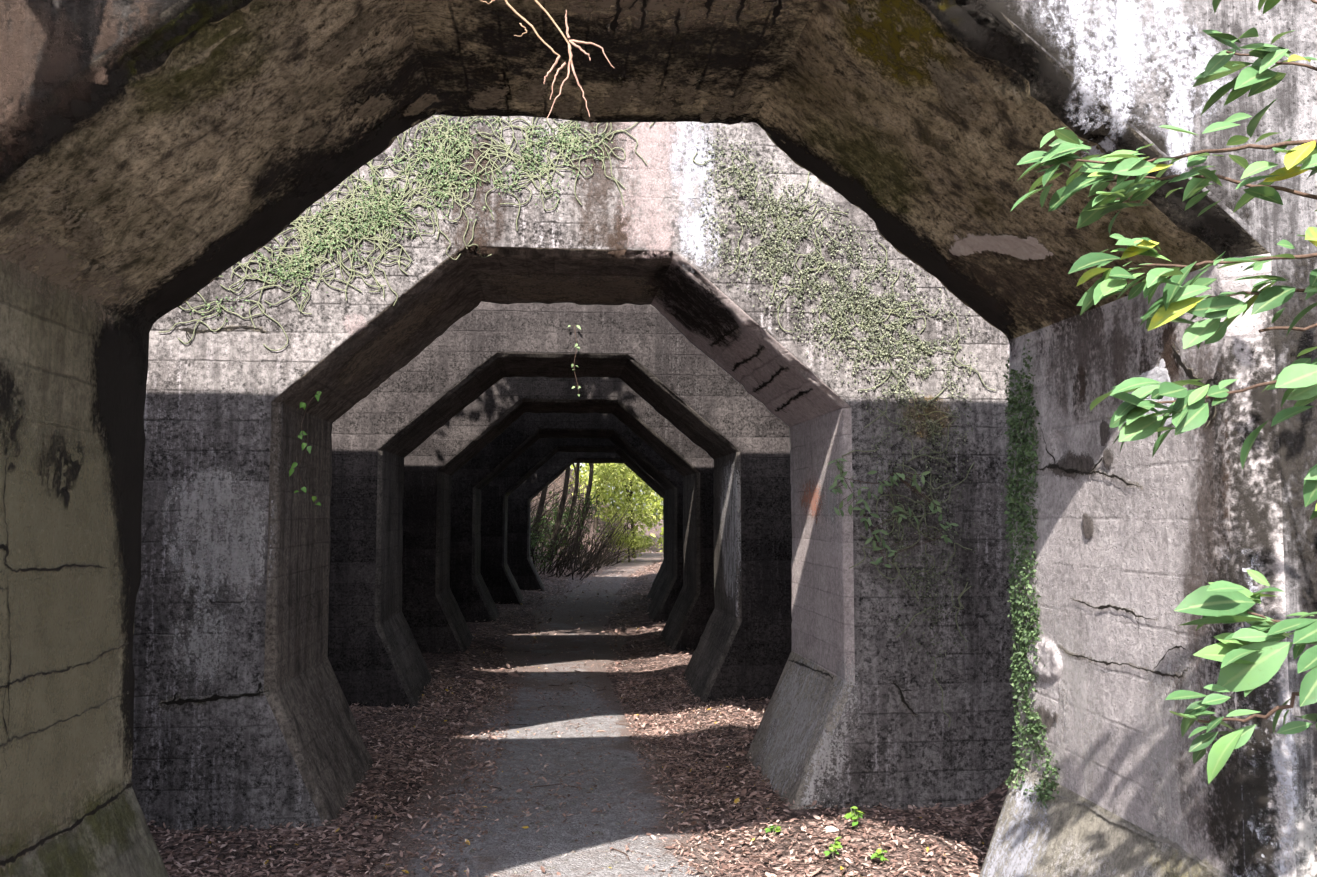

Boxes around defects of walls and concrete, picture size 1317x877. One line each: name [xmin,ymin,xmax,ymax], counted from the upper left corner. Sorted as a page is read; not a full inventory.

crack [710,326,813,413]
peeling [1123,359,1174,427]
spalling [1052,421,1113,480]
damp [1207,249,1317,645]
spalling [1082,513,1094,539]
crack [0,460,129,765]
crack [1057,598,1190,678]
crack [159,682,270,710]
damp [755,659,858,809]
damp [980,653,1197,877]
damp [1208,661,1317,877]
crack [0,781,133,870]